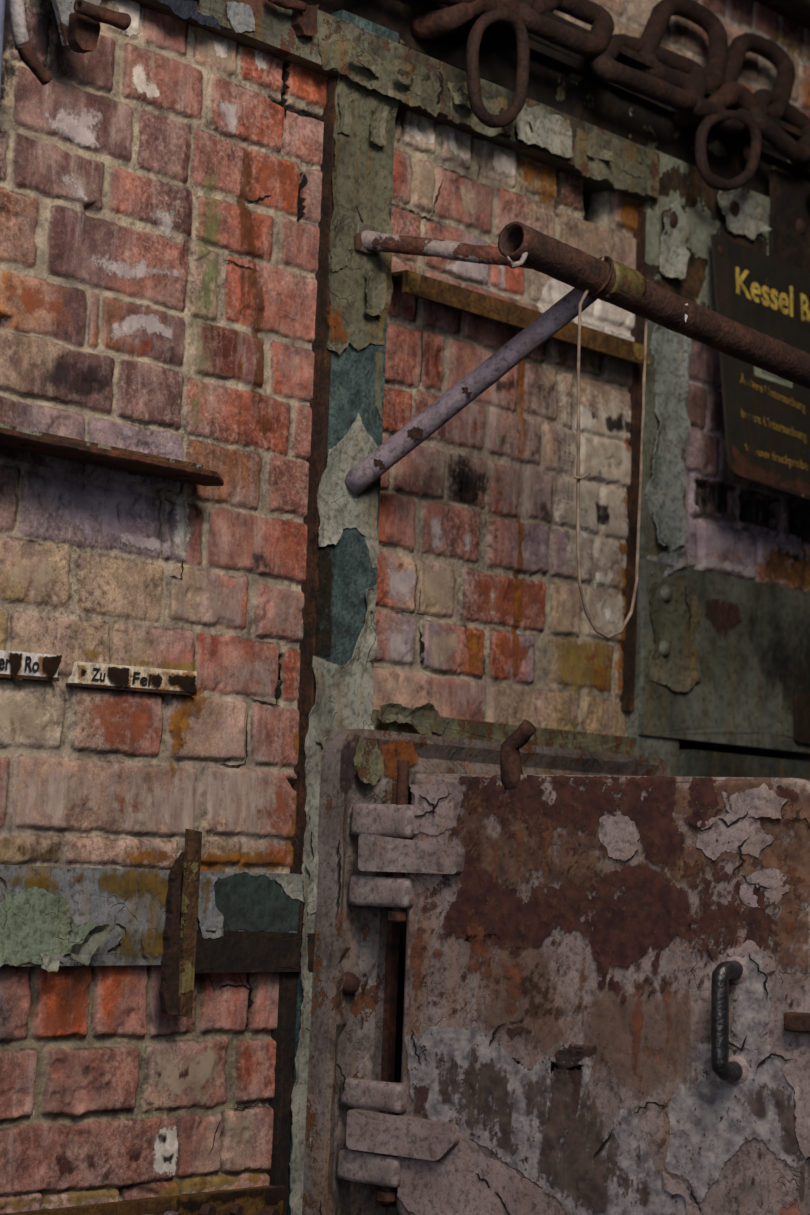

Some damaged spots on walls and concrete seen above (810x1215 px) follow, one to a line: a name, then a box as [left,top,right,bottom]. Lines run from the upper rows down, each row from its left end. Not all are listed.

peeling [298,33,652,356]
corrosion [621,203,647,276]
peeling [317,413,417,588]
corrosion [555,315,650,711]
corrosion [160,901,315,1215]
peeling [198,584,450,1215]
crack [475,1173,510,1215]
peeling [397,940,810,1215]
corrosion [410,775,810,1020]
crack [594,1102,667,1157]
crack [749,954,768,998]
crack [729,1035,793,1068]